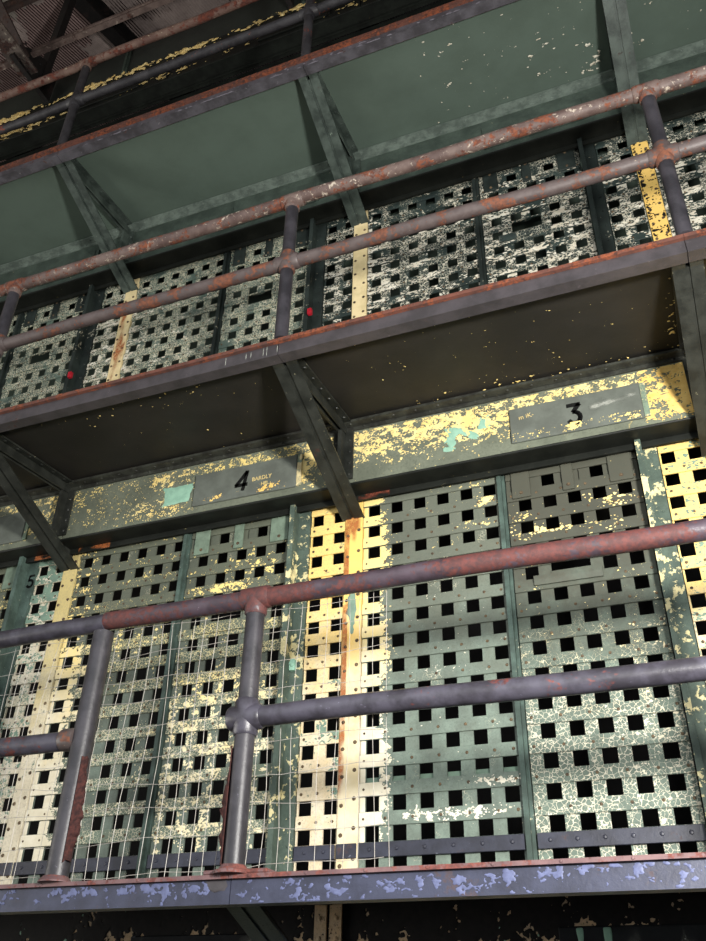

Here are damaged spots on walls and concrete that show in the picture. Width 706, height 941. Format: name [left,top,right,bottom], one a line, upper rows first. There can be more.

peeling [367,189,597,313]
peeling [69,444,320,530]
corrosion [344,517,359,575]
peeling [363,497,397,572]
peeling [44,638,90,733]
peeling [361,590,394,693]
peeling [17,752,67,862]
corrosion [62,756,89,863]
corrosion [218,746,233,865]
peeling [358,713,399,843]
peeling [0,881,246,941]
peeling [235,861,706,941]